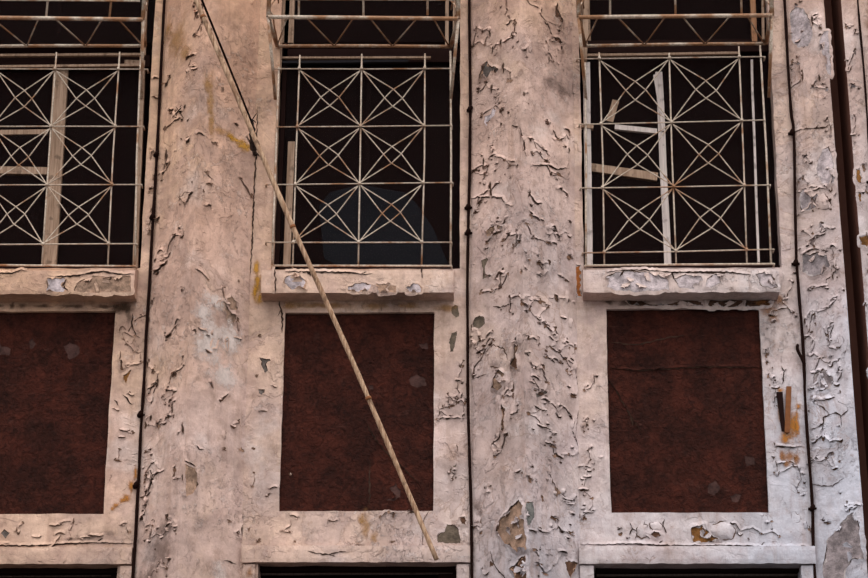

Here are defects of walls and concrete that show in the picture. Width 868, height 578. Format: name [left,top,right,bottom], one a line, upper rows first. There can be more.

peeling [528,136,567,198]
peeling [792,115,838,216]
peeling [281,271,310,293]
peeling [345,279,425,296]
peeling [602,221,846,411]
spalling [434,301,496,422]
peeling [479,203,605,578]
rust [779,404,800,466]
peeling [772,425,843,496]
spalling [0,521,24,544]
spalling [434,515,483,545]
peeling [819,491,867,578]